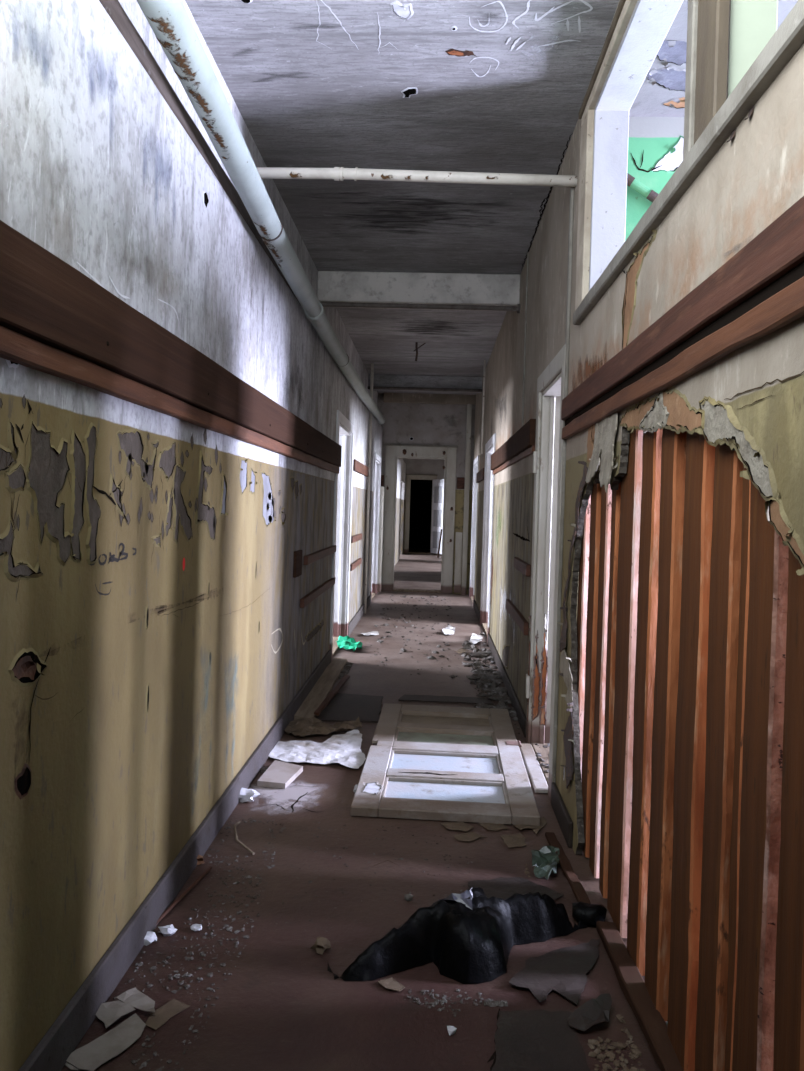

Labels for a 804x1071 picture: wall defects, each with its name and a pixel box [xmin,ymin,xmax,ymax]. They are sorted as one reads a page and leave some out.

rust [147,16,228,160]
peeling [645,39,687,109]
peeling [650,135,684,174]
peeling [0,395,102,597]
peeling [109,428,302,561]
spalling [619,388,804,576]
spalling [8,647,51,800]
crack [488,1008,500,1071]